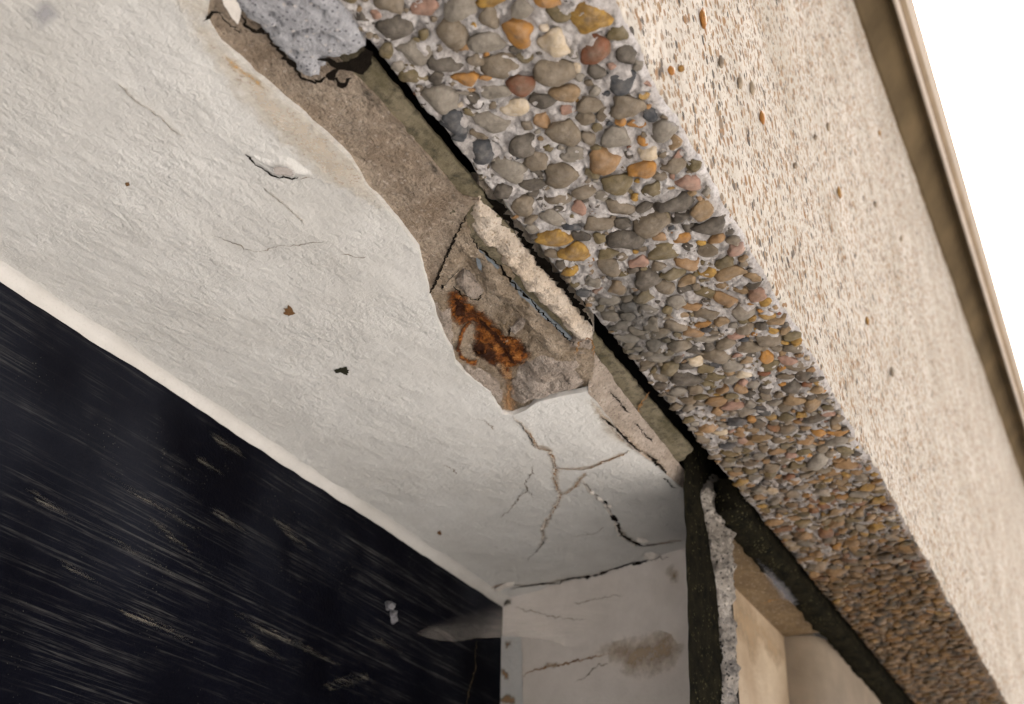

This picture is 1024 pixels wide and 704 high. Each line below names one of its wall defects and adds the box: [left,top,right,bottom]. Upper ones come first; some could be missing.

peeling [207,0,594,411]
corrosion [448,291,530,409]
crack [481,392,682,621]
crack [526,653,610,681]